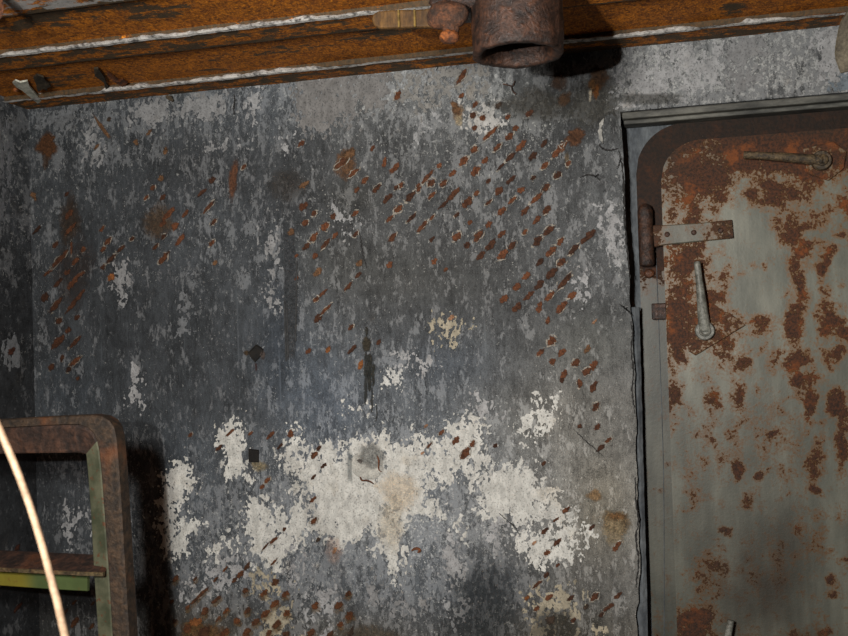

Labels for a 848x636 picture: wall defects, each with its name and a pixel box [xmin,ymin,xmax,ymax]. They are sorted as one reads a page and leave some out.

peeling [606,40,734,110]
peeling [800,29,848,92]
leakage [362,327,378,422]